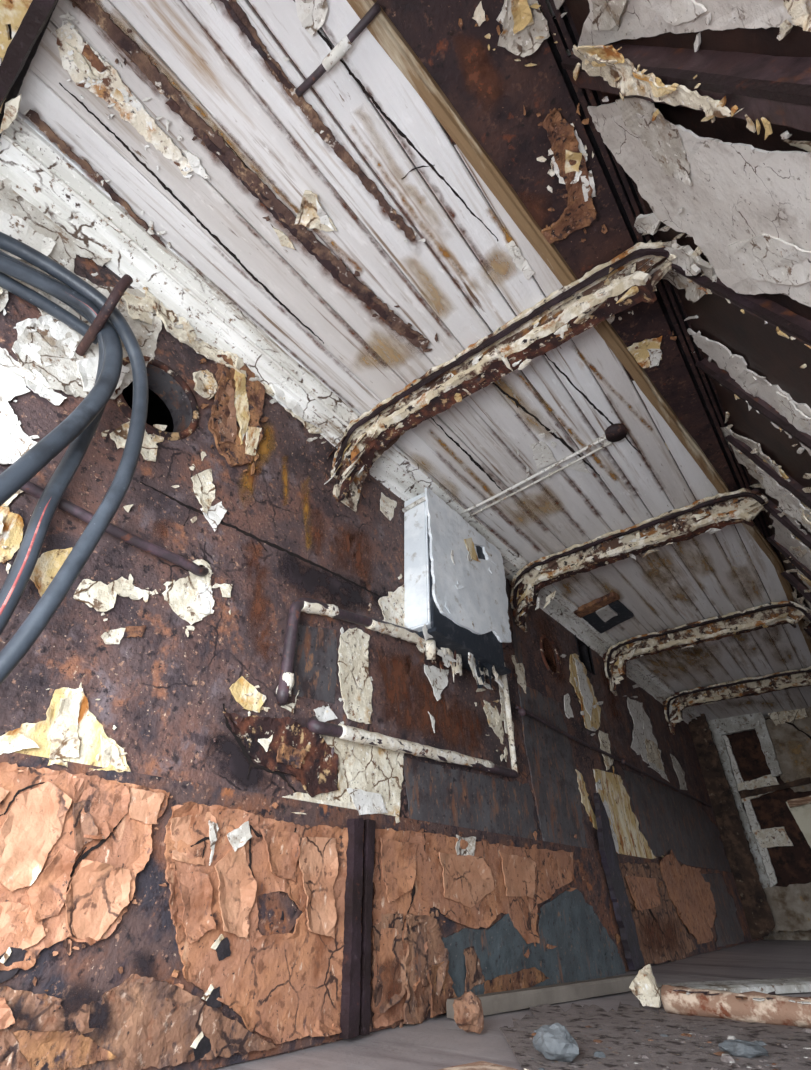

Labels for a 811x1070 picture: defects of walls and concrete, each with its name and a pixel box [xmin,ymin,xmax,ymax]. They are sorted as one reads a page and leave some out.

spalling [0,94,171,248]
spalling [0,178,367,485]
spalling [51,0,438,352]
rust [319,299,386,366]
rust [381,251,450,336]
peeling [458,0,811,456]
rust [243,428,272,490]
rust [282,557,388,608]
rust [619,523,673,560]
rust [682,512,721,534]
peeling [0,624,626,1070]
peeling [561,649,731,965]